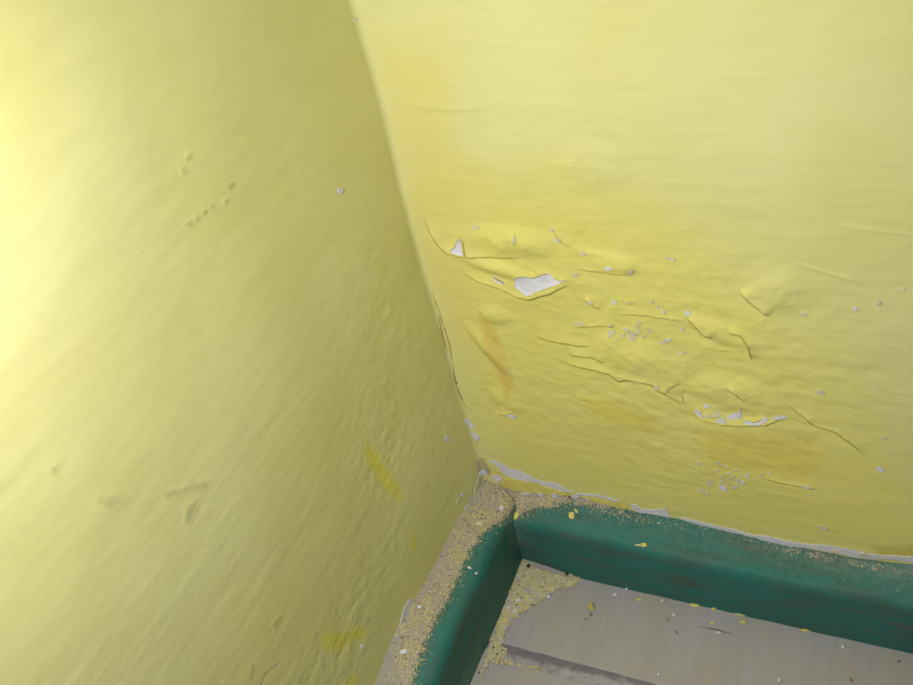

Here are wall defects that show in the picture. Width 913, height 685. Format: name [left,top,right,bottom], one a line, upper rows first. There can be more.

peeling [450,238,466,257]
peeling [492,270,578,296]
damp [358,12,913,565]
peeling [608,321,652,341]
crack [686,316,752,360]
crack [537,336,684,402]
peeling [695,403,787,426]
crack [786,403,866,457]
peeling [374,458,913,685]